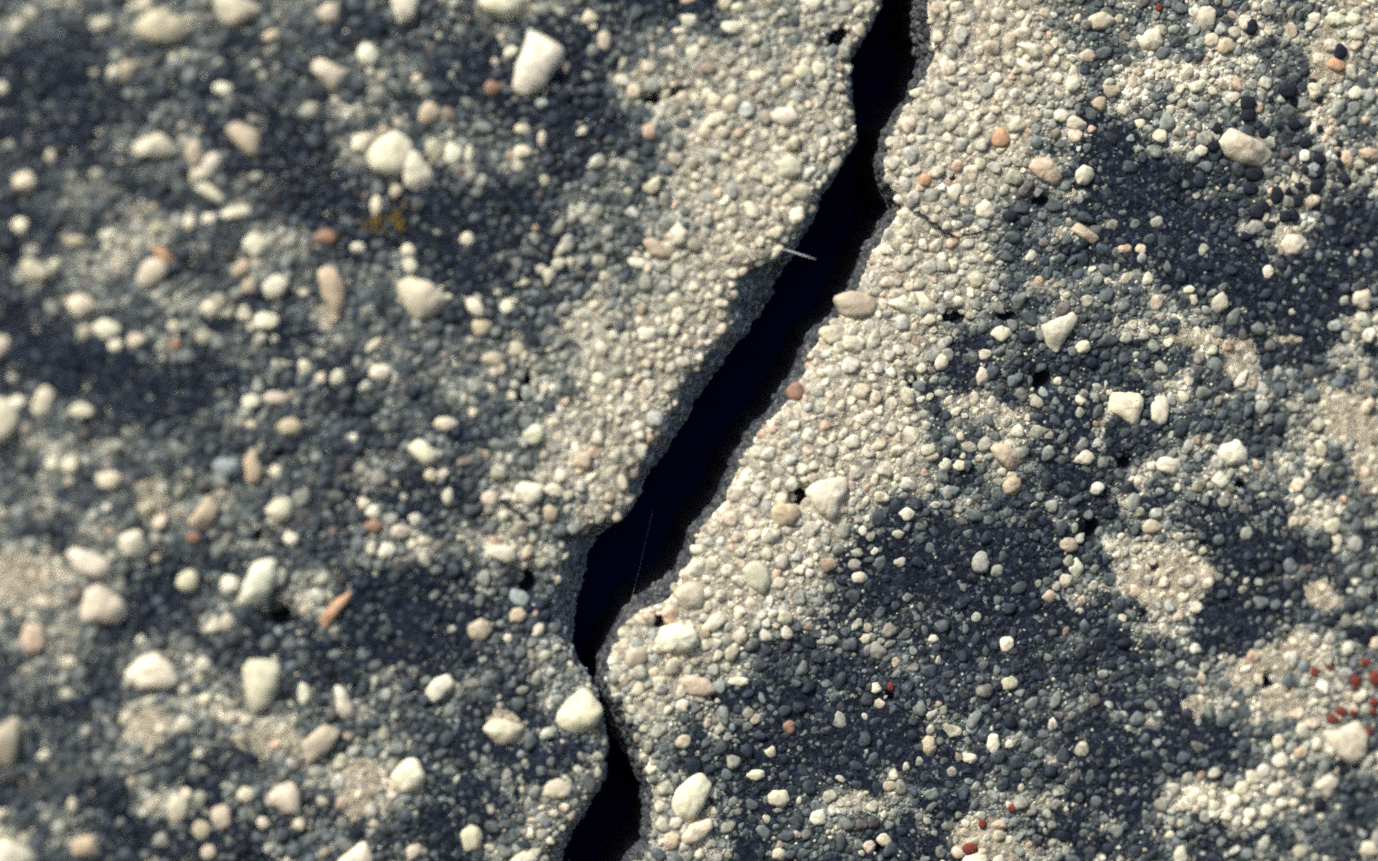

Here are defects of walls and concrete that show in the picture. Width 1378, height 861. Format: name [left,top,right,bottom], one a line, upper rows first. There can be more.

crack [460,0,994,861]